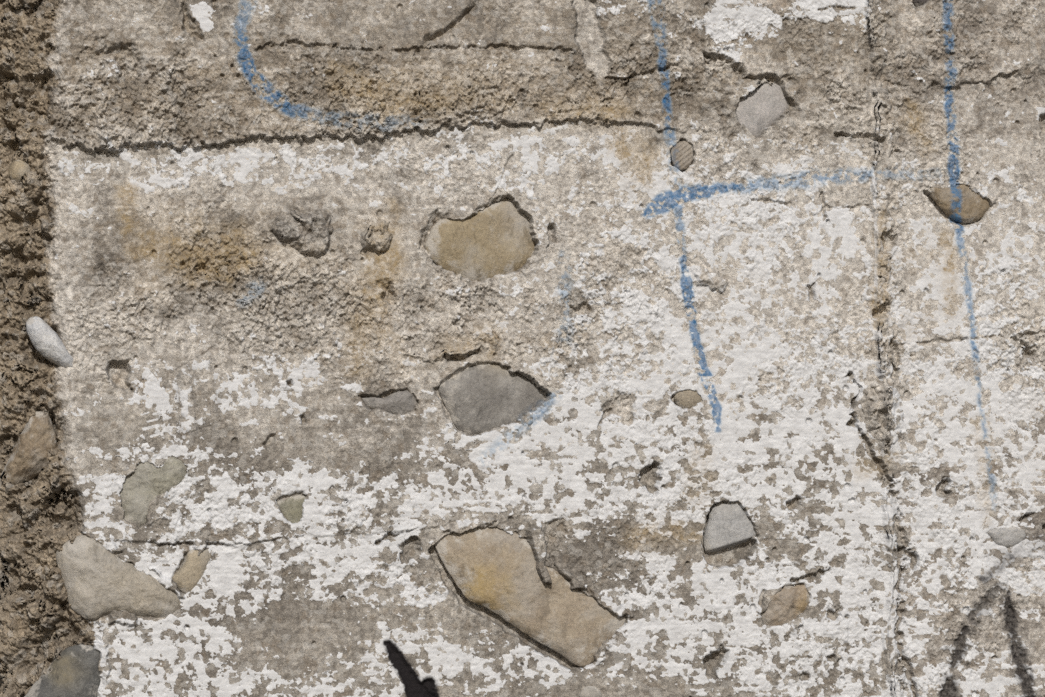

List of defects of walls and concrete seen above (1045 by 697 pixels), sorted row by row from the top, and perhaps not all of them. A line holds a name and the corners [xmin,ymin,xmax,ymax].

spalling [0,0,663,697]
peeling [649,399,887,697]
crack [844,371,921,697]